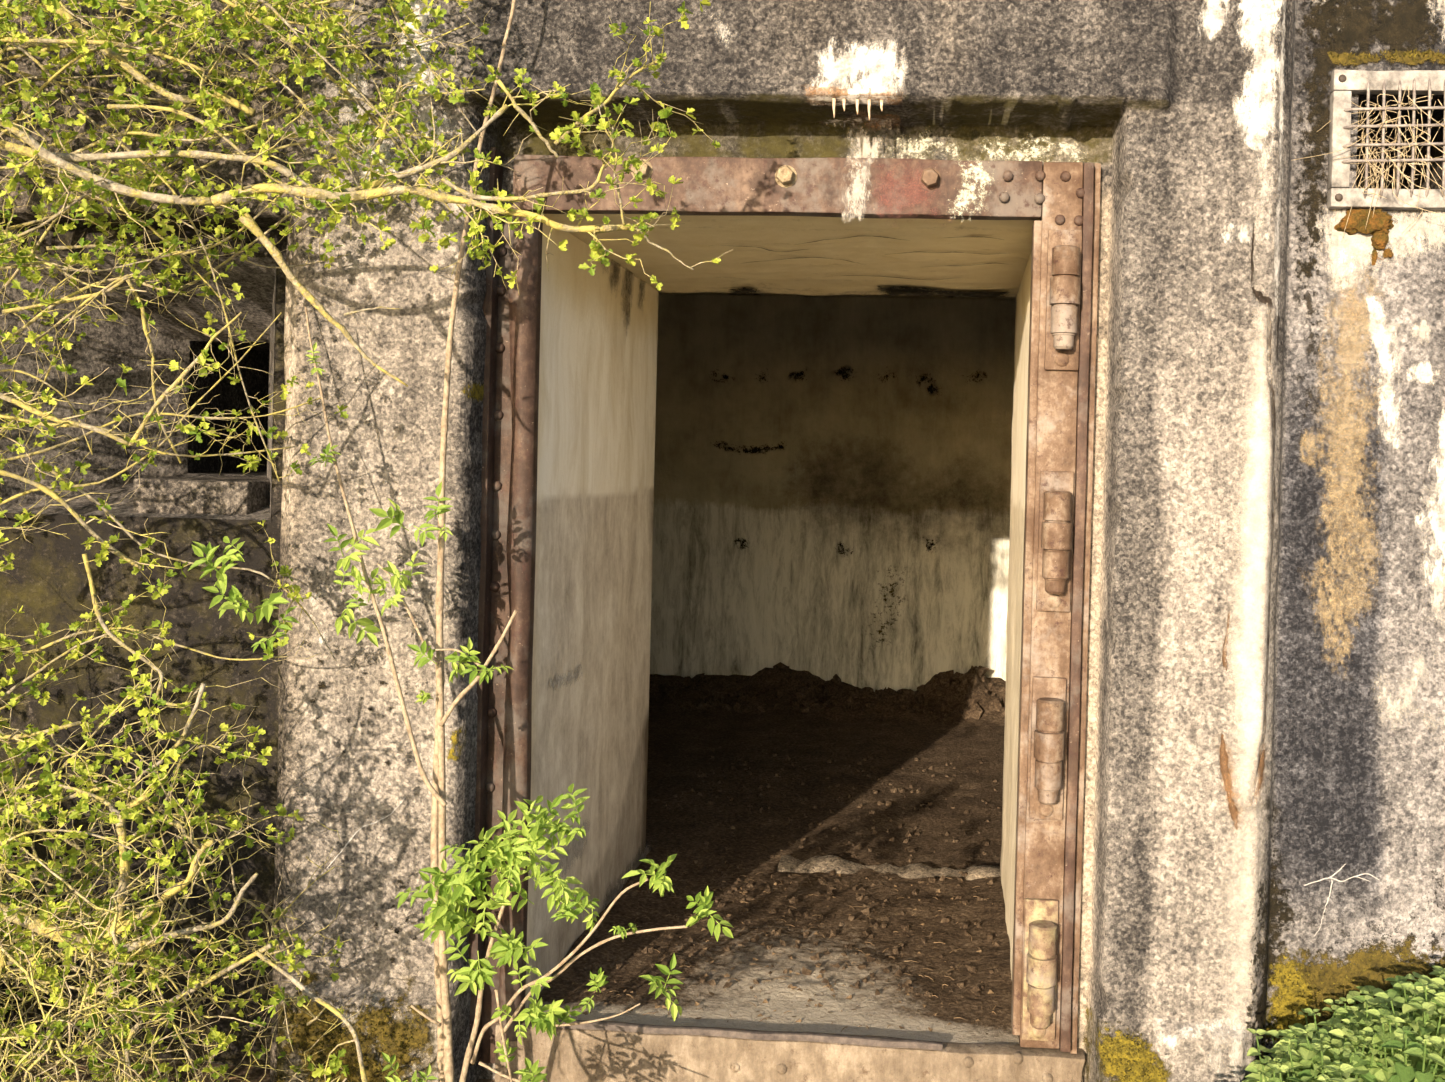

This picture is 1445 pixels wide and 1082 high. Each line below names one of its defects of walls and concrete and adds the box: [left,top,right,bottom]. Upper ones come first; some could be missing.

damp [807,37,959,220]
damp [983,134,1082,162]
damp [1198,0,1445,449]
rust [869,567,906,643]
crack [1220,226,1279,830]
damp [1416,404,1445,619]